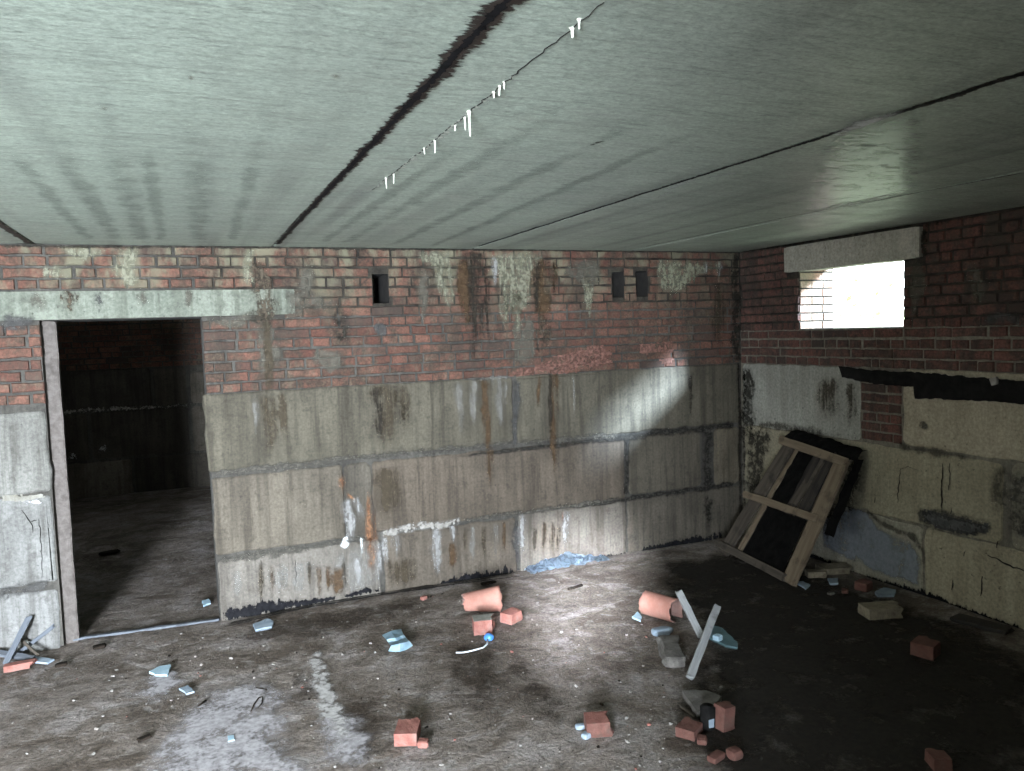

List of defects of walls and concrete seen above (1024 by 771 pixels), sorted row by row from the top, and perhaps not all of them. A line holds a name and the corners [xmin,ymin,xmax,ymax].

crack [372,2,604,190]
water stain [0,0,1024,447]
water stain [469,221,942,524]
crack [22,511,43,572]
corrosion [340,479,376,566]
corrosion [480,381,493,479]
water stain [900,442,965,459]
crack [941,463,952,514]